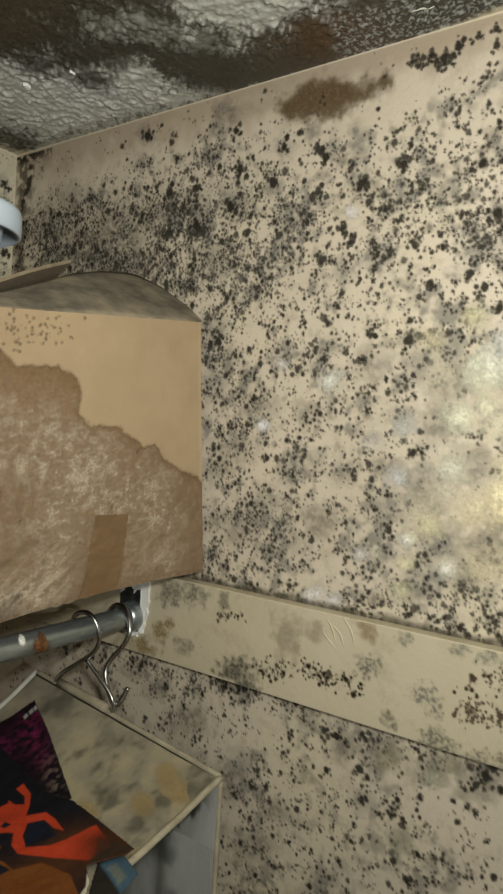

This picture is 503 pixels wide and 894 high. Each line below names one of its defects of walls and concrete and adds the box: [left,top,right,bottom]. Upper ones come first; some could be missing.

water stain [0,0,503,121]
water stain [0,22,503,647]
peeling [120,582,151,637]
water stain [36,639,503,894]